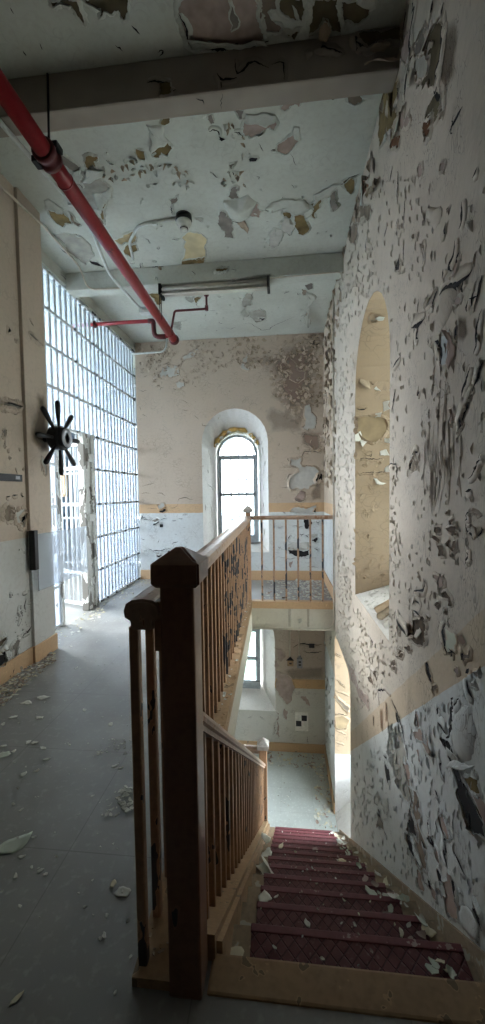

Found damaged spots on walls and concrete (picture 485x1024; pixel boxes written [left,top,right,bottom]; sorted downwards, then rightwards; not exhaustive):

peeling [48,0,131,28]
crack [198,56,289,106]
peeling [61,118,194,226]
peeling [44,199,104,268]
peeling [114,229,163,305]
peeling [0,396,24,415]
water stain [276,337,318,406]
peeling [138,0,485,945]
flaking render [0,502,28,532]
peeling [0,591,32,668]